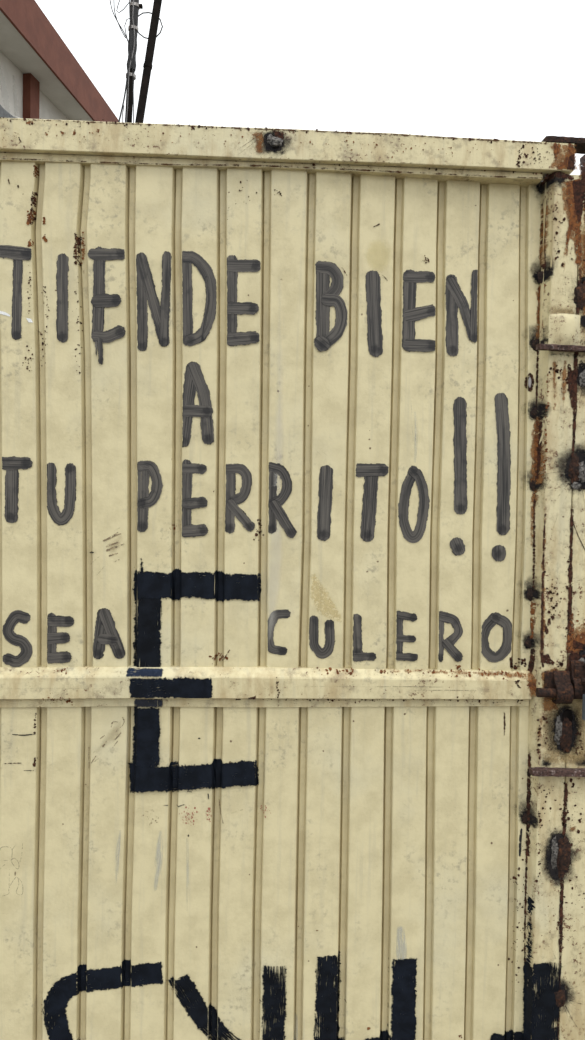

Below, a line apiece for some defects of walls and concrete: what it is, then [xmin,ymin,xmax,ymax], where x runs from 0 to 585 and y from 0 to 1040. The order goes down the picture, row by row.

corrosion [73,232,85,331]
corrosion [0,117,585,285]
corrosion [375,284,585,985]